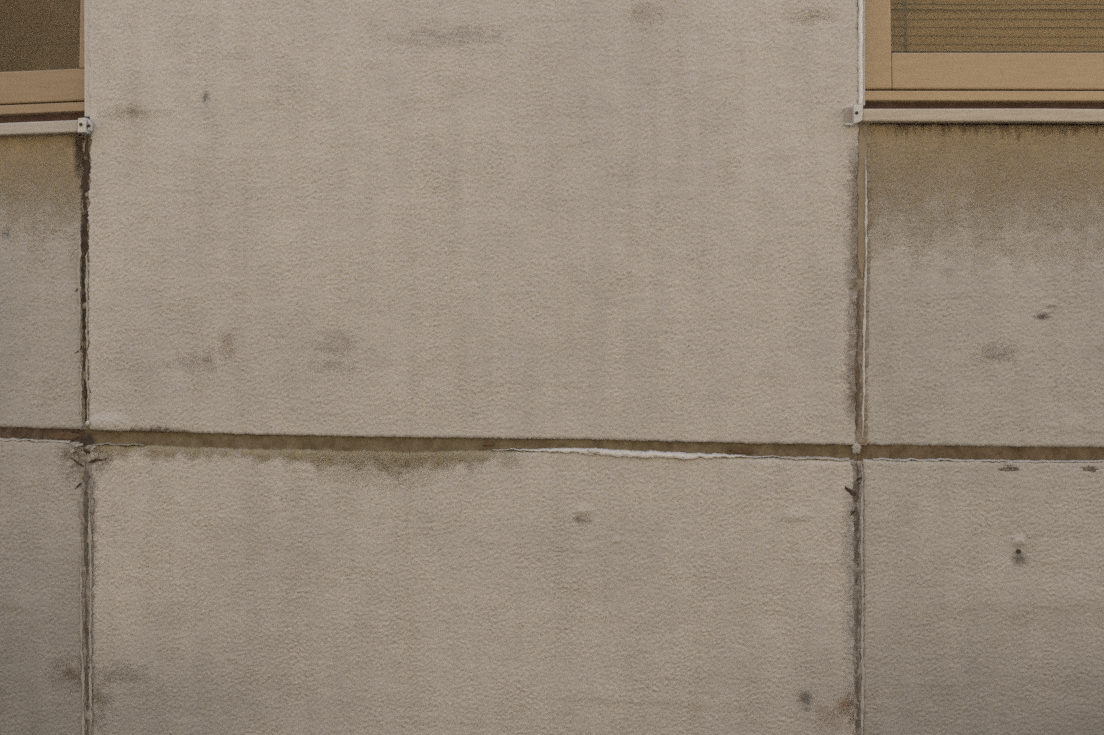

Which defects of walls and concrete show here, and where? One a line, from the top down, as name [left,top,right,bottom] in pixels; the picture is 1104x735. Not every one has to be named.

damp [867,124,1104,215]
damp [98,444,497,466]